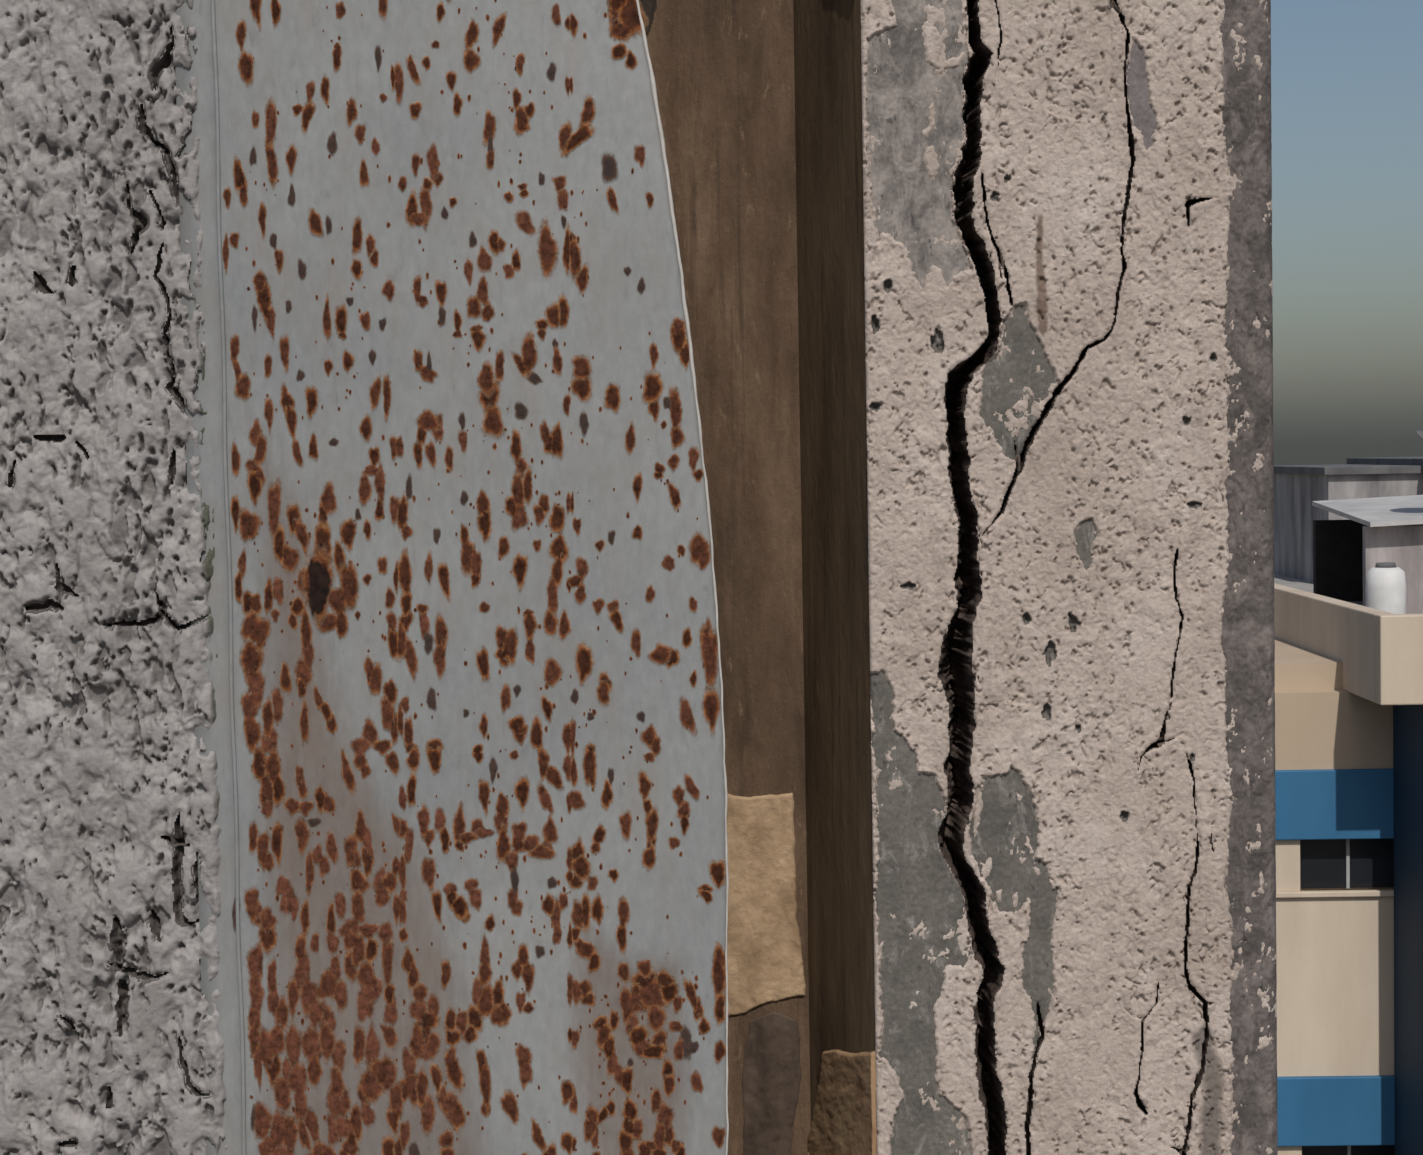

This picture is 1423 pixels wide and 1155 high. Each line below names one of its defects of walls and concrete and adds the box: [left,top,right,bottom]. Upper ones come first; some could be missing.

peeling [865,0,972,291]
crack [104,582,209,633]
corrosion [222,0,726,1155]
peeling [808,671,973,1155]
peeling [966,768,1058,1063]
crack [937,0,1137,1155]
spalling [1041,703,1051,721]
crack [1119,548,1216,1155]